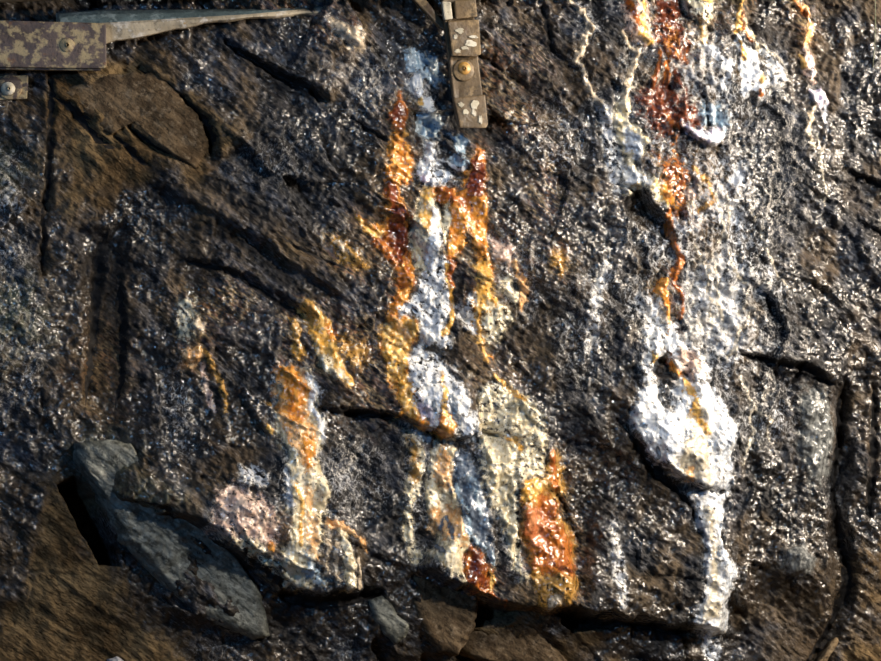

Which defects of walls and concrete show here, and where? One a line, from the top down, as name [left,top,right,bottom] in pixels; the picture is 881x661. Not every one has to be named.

corrosion [288,91,433,435]
corrosion [431,148,499,362]
leakage [397,48,549,586]
corrosion [550,250,566,276]
corrosion [635,0,717,365]
crack [849,171,881,188]
corrosion [462,543,508,609]
corrosion [518,449,579,614]
crack [559,611,685,634]
leakage [629,258,750,661]
crack [738,353,855,661]
crack [865,387,879,515]